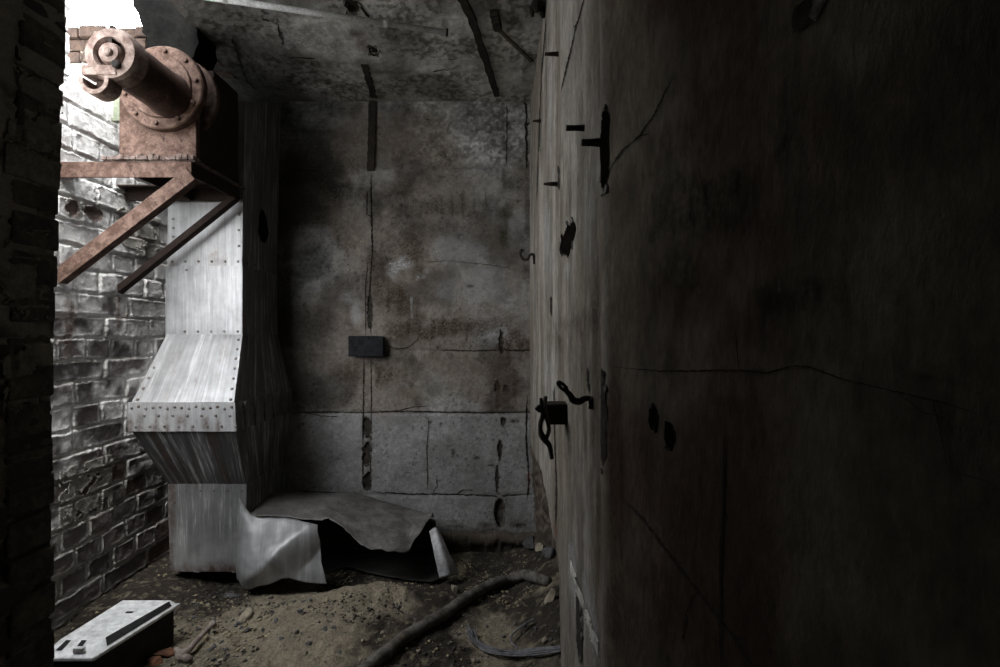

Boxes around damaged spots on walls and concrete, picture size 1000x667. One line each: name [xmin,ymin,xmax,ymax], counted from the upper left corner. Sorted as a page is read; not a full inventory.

crack [609,77,674,170]
spalling [559,217,576,258]
spalling [361,416,373,491]
spalling [475,440,519,528]
hole [648,403,674,451]
crack [616,332,997,484]